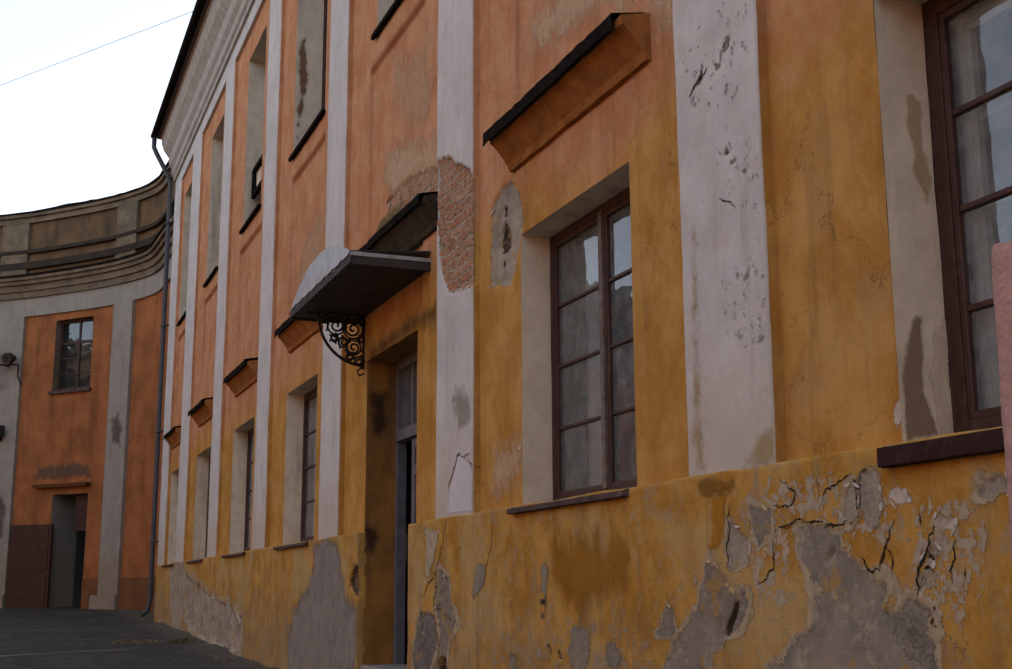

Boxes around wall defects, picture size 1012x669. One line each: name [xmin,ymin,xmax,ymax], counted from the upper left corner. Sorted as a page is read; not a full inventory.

peeling [681,2,749,108]
flaking render [384,136,473,293]
spalling [489,180,523,289]
damp [903,318,936,440]
spalling [169,562,244,657]
spalling [349,564,358,596]
spalling [411,528,459,669]
peeling [447,456,472,513]
spalling [492,467,1008,669]
crack [756,473,863,585]